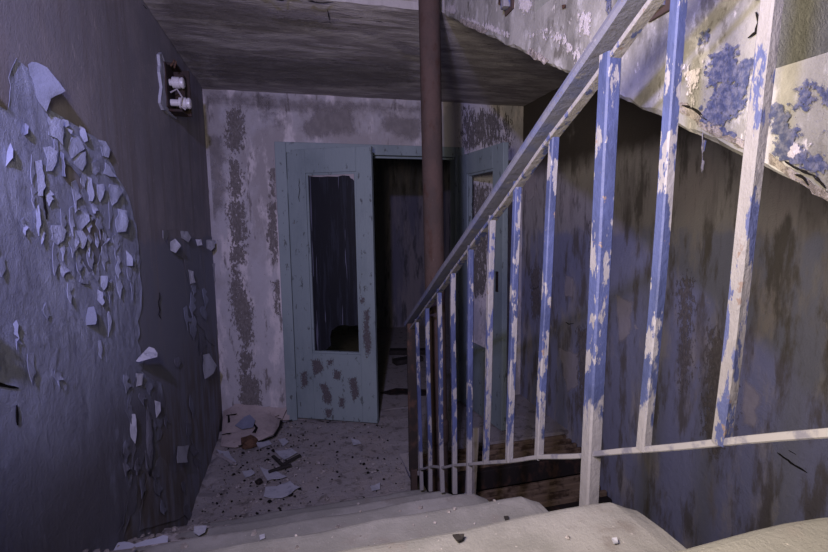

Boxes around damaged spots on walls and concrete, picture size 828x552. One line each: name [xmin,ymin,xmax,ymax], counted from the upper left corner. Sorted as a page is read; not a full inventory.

leakage [303,109,354,136]
spalling [526,48,549,65]
peeling [679,43,754,173]
peeling [768,78,828,201]
peeling [0,58,207,552]
peeling [163,230,218,379]
leakage [209,106,263,406]
leakage [266,168,279,265]
leakage [270,280,281,315]